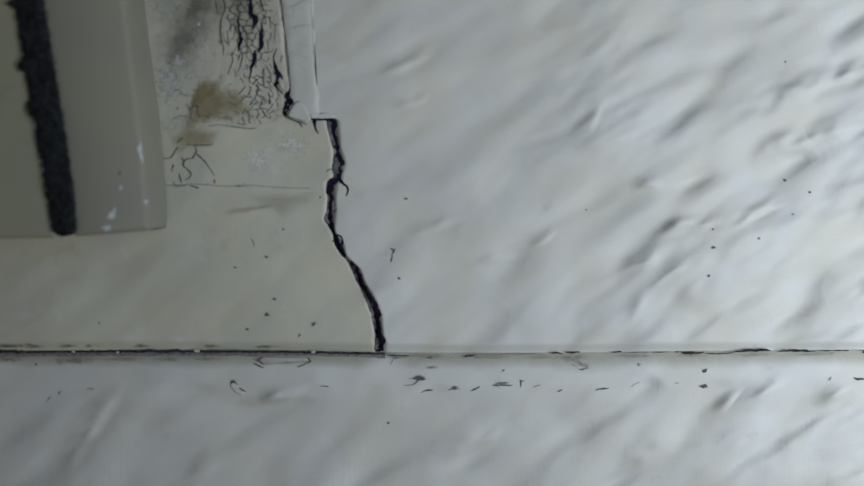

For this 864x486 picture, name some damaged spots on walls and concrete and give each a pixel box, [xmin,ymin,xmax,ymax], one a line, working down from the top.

crack [163,0,386,352]